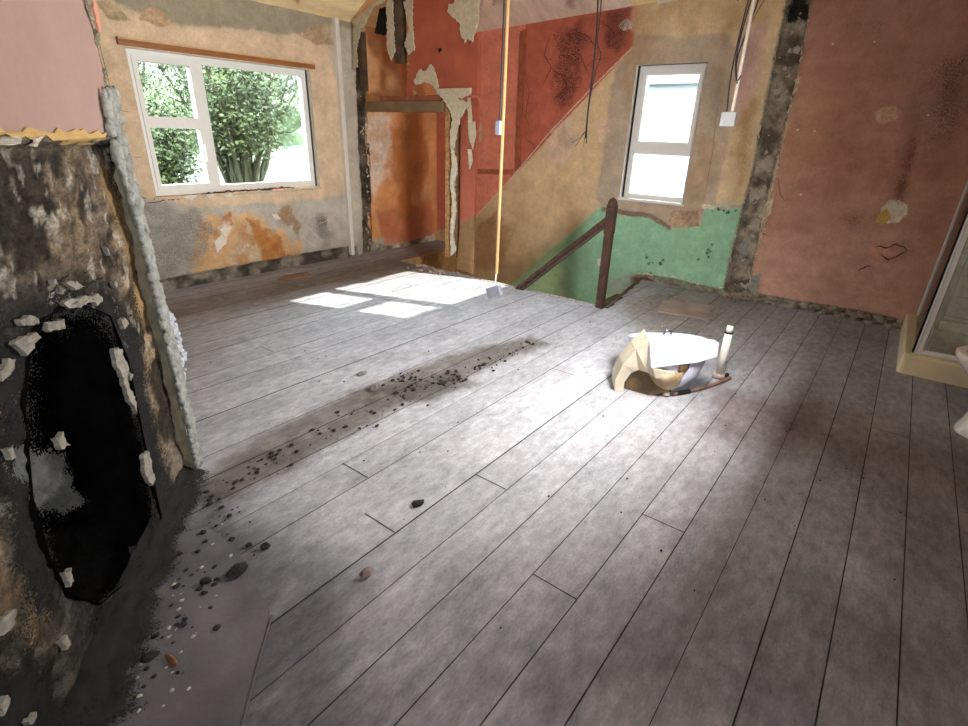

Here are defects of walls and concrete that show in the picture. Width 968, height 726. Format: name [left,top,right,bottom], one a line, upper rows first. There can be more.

peeling [0,127,107,147]
peeling [467,97,476,170]
flaking render [701,0,908,329]
peeling [60,280,103,306]
peeling [0,315,66,382]
flaking render [169,311,187,381]
peeling [0,447,16,460]
peeling [51,431,70,450]
peeling [139,451,155,486]
peeling [0,609,17,636]
peeling [0,695,11,717]
peeling [22,711,37,726]